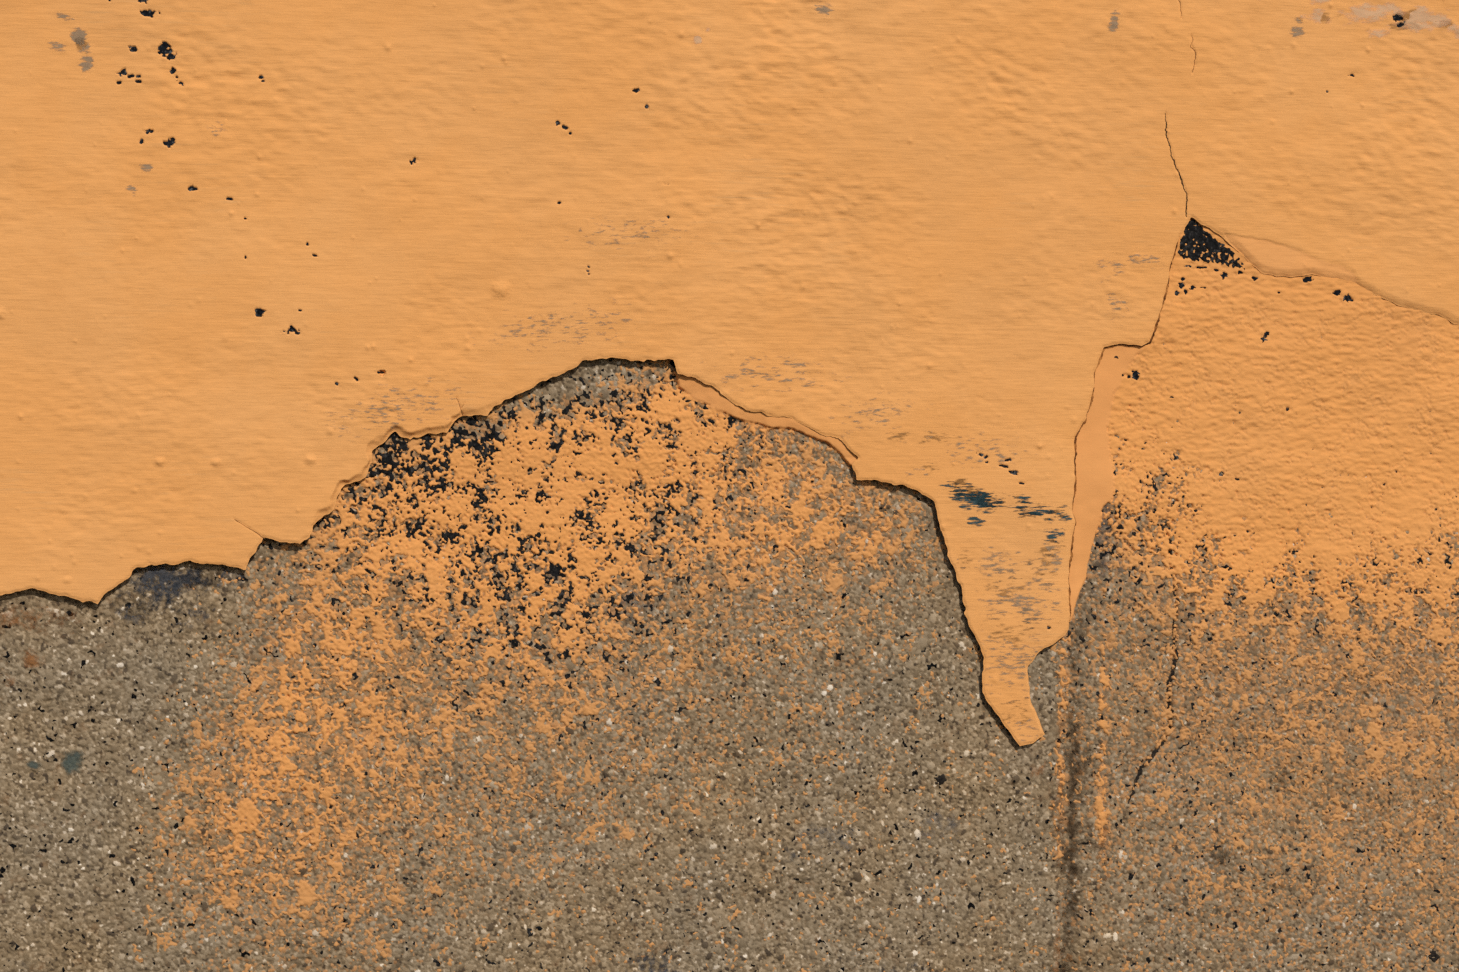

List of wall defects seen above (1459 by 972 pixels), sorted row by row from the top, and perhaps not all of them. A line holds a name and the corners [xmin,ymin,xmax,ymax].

peeling [0,217,1459,972]
crack [1068,113,1188,621]